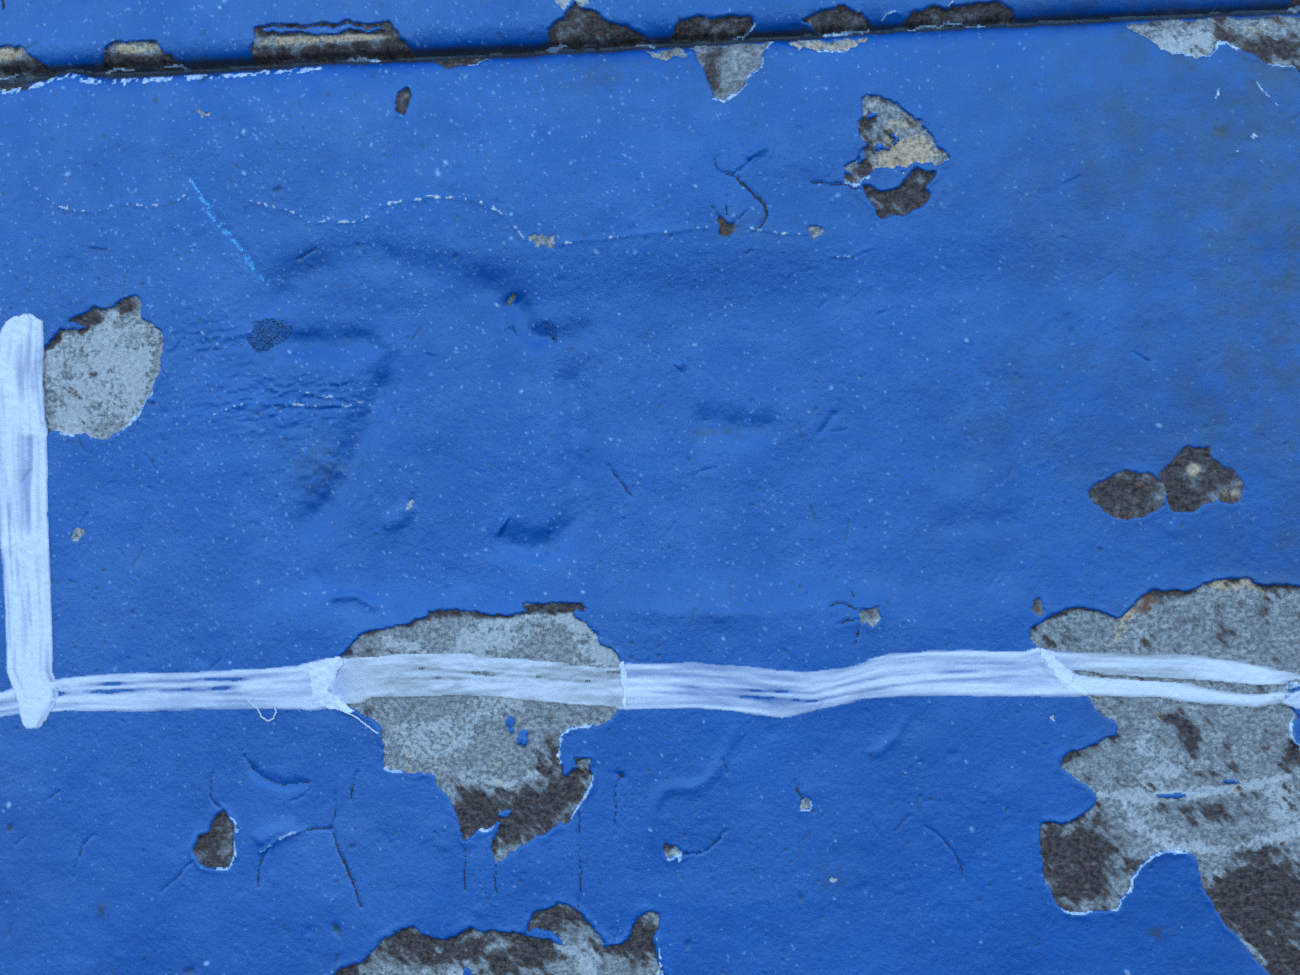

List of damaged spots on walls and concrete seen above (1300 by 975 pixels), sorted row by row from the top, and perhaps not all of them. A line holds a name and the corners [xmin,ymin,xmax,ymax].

peeling [0,20,417,94]
peeling [546,0,773,103]
peeling [789,5,873,53]
peeling [902,1,1015,31]
peeling [1127,0,1300,72]
peeling [844,95,949,218]
peeling [43,296,164,440]
peeling [340,603,620,682]
peeling [347,695,617,862]
peeling [1030,578,1300,975]
peeling [192,811,235,870]
peeling [336,903,663,975]